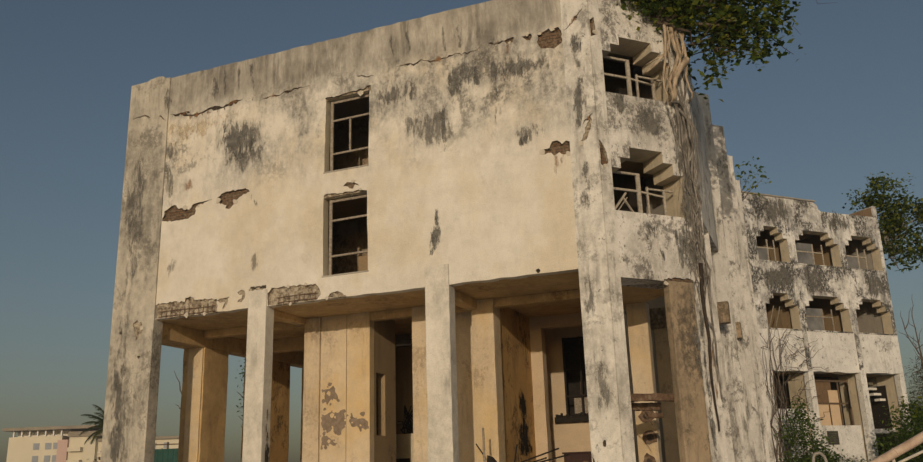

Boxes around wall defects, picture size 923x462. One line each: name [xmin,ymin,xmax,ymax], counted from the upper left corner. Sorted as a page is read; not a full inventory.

crack [397,40,505,67]
flaking render [505,26,562,49]
crack [133,86,307,120]
damp [491,55,549,119]
damp [570,34,586,127]
damp [218,120,262,172]
flaking render [539,117,592,156]
flaking render [162,188,250,222]
damp [637,106,703,276]
damp [430,211,441,254]
flaking render [157,290,245,319]
flaking render [268,283,346,306]